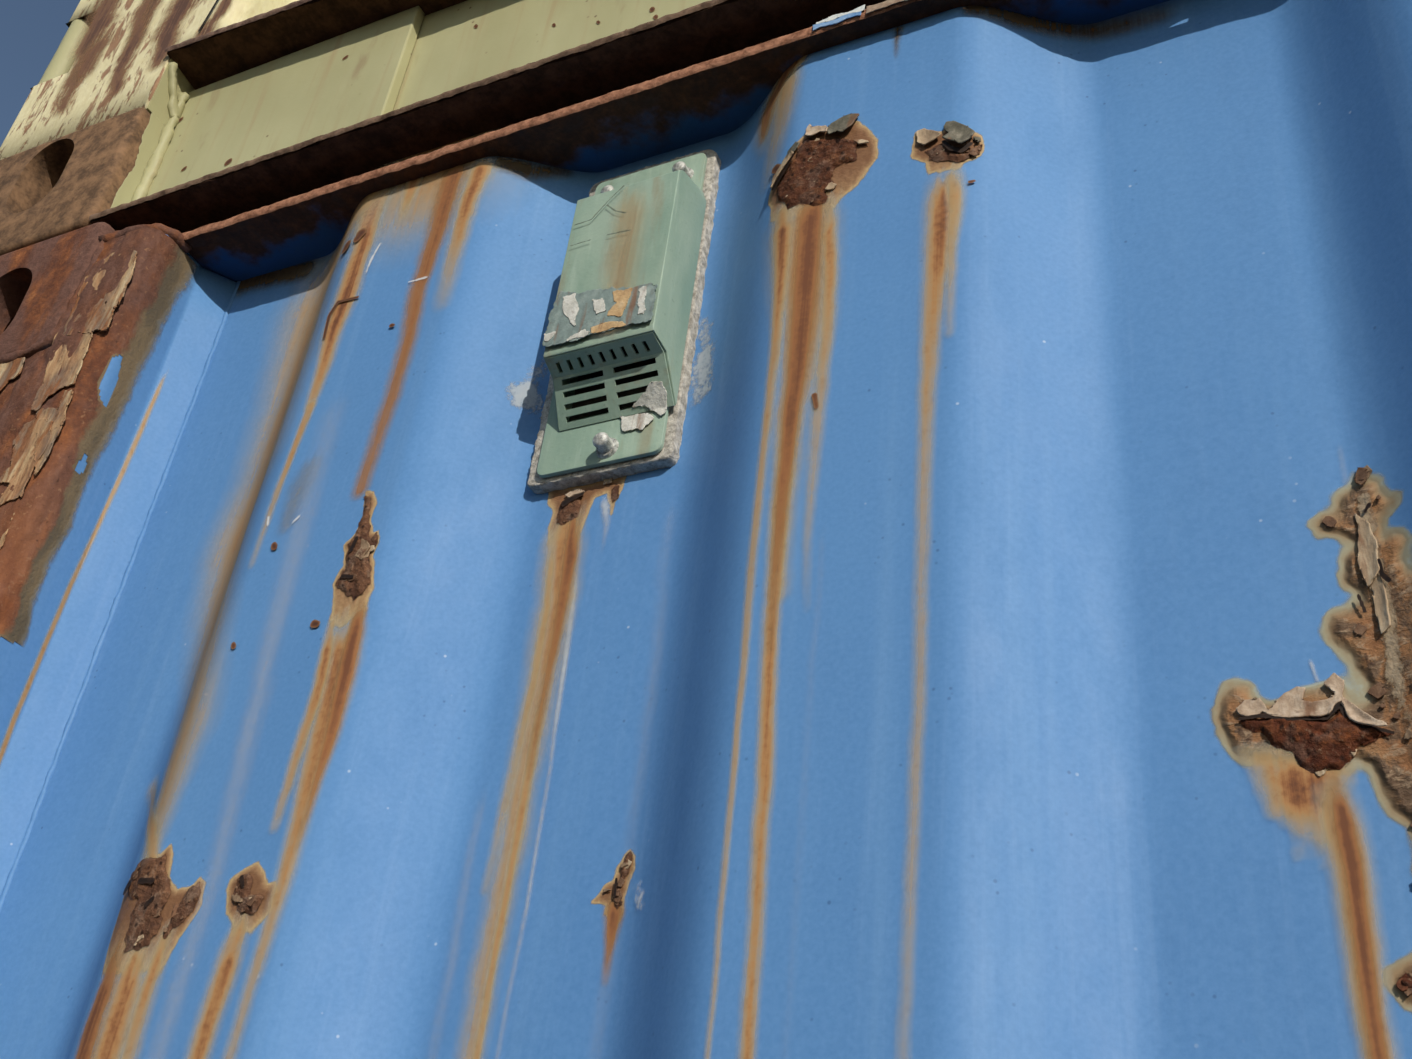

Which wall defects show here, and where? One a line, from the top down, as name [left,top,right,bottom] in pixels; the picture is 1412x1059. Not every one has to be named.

rust [761,55,807,141]
rust [964,6,1164,37]
peeling [0,250,137,549]
rust [0,227,196,763]
rust [75,156,569,1059]
rust [465,476,627,1059]
rust [591,849,635,967]
peeling [1211,465,1412,1059]